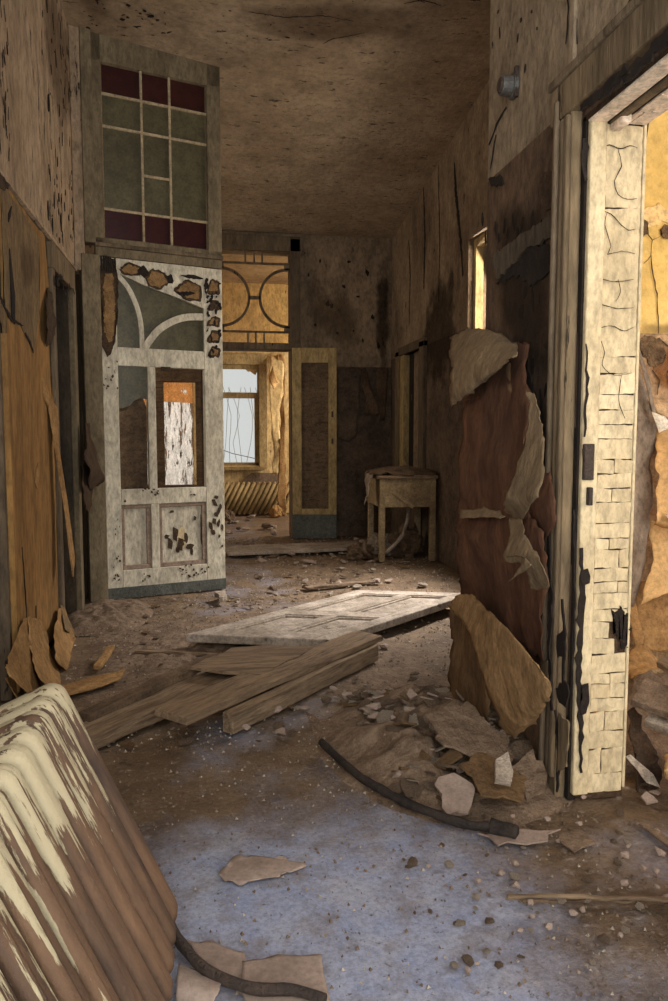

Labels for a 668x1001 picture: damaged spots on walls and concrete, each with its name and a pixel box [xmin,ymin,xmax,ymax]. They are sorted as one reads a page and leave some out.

crack [248,11,362,44]
peeling [48,84,74,243]
peeling [581,138,589,181]
flaking render [643,220,668,238]
peeling [582,344,590,462]
crack [588,89,668,793]
peeling [540,510,591,792]